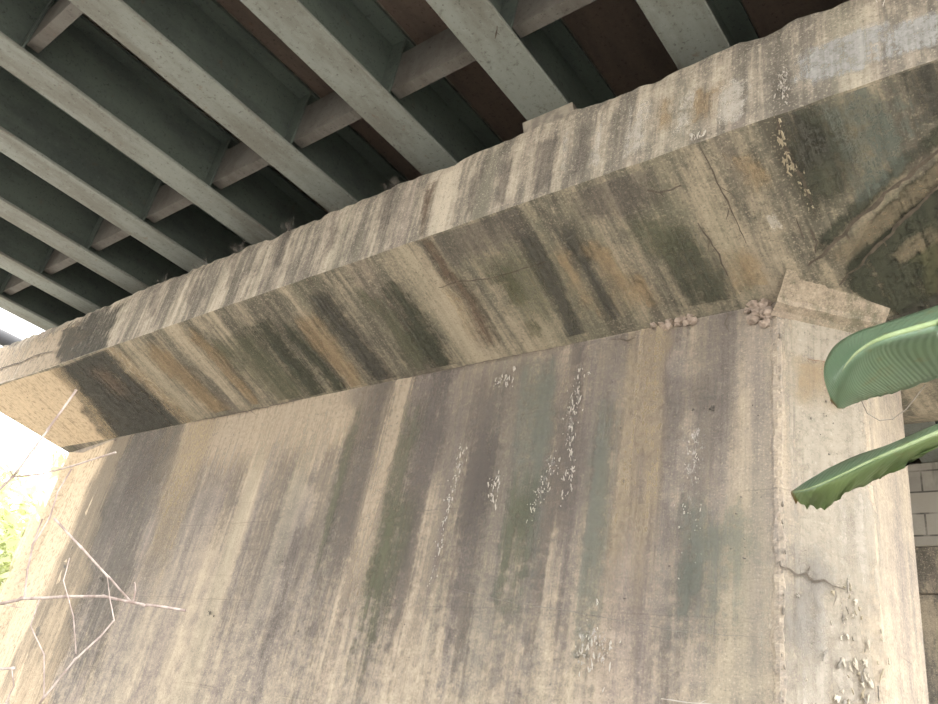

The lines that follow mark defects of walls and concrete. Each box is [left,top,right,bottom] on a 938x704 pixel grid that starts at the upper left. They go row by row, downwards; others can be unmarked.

crack [699,145,746,243]
water stain [789,63,938,321]
water stain [382,281,454,368]
water stain [521,235,584,337]
water stain [555,225,619,319]
water stain [654,229,730,306]
crack [697,223,728,276]
water stain [784,319,869,486]
water stain [0,293,424,704]
crack [780,566,846,606]
water stain [774,483,880,704]
peeling [834,637,890,704]